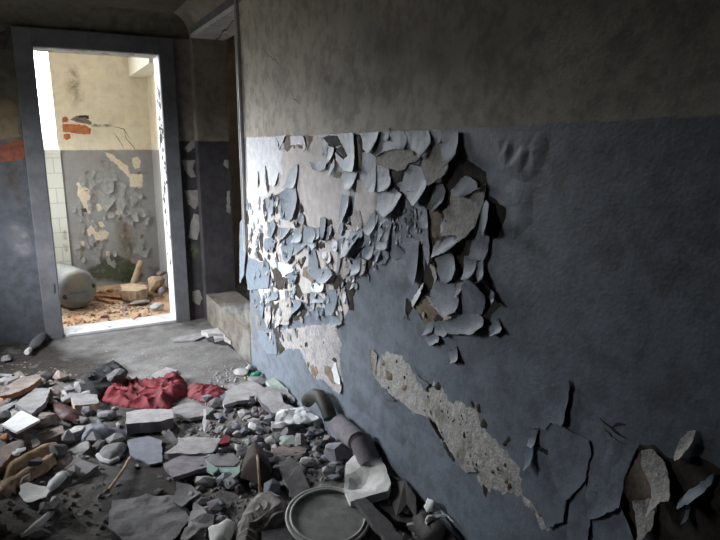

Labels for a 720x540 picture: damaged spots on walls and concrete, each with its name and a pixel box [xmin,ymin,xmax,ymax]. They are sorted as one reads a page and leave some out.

flaking render [61,115,92,141]
peeling [69,152,152,268]
peeling [182,138,196,178]
peeling [185,190,200,240]
peeling [239,127,506,394]
peeling [369,348,720,540]